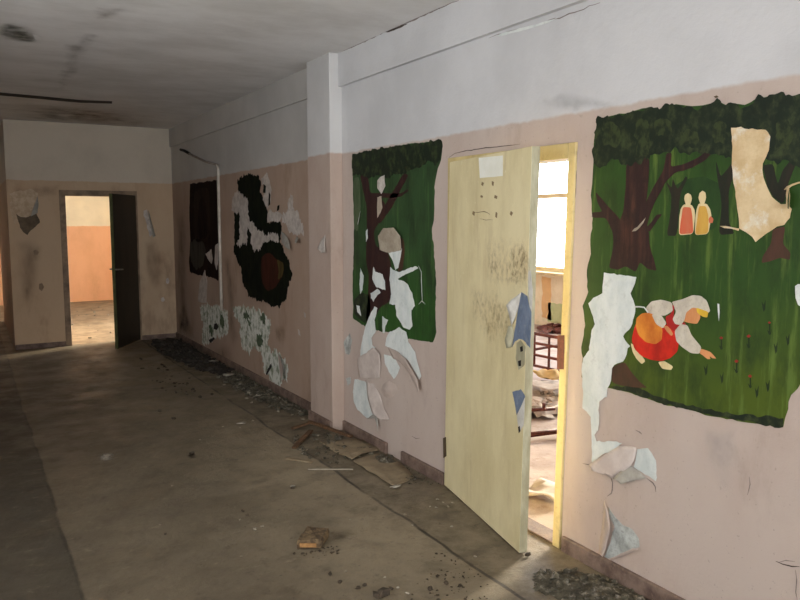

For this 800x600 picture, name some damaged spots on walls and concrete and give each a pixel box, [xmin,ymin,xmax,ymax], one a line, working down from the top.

crack [490,3,598,38]
peeling [9,189,40,235]
peeling [232,173,304,253]
peeling [721,127,800,242]
peeling [198,244,289,386]
peeling [344,228,425,430]
peeling [582,273,657,560]